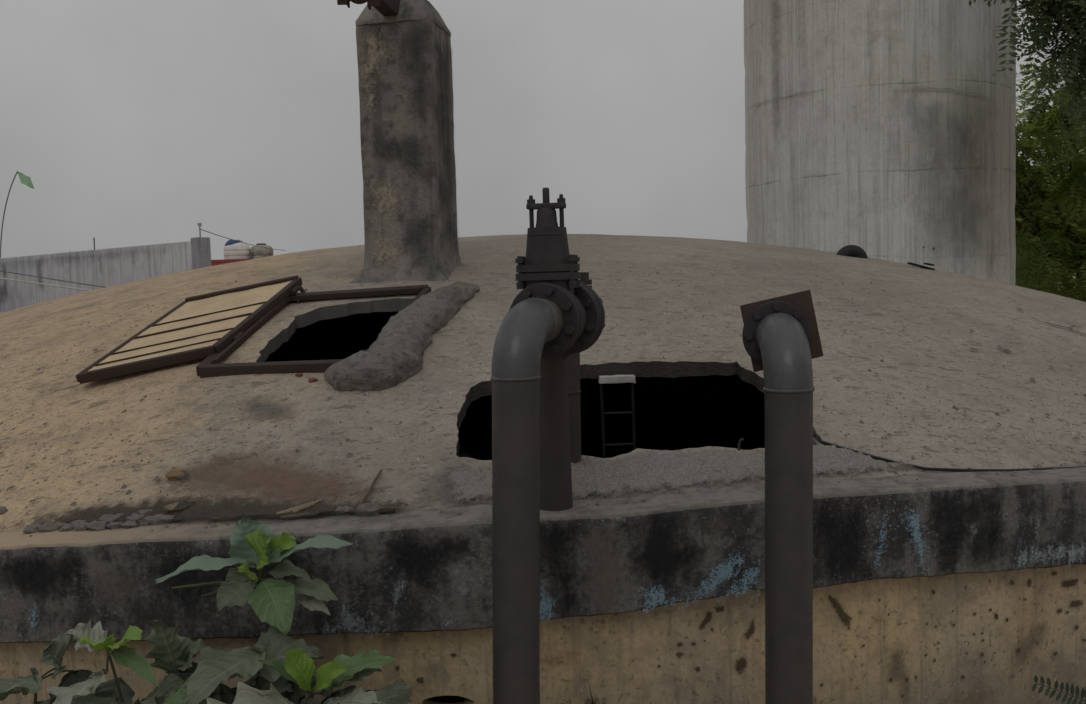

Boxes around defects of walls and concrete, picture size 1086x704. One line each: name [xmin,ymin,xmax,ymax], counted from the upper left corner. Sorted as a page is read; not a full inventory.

leakage [151,551,313,606]
leakage [633,520,704,581]
leakage [931,490,1003,570]
leakage [1018,545,1085,568]